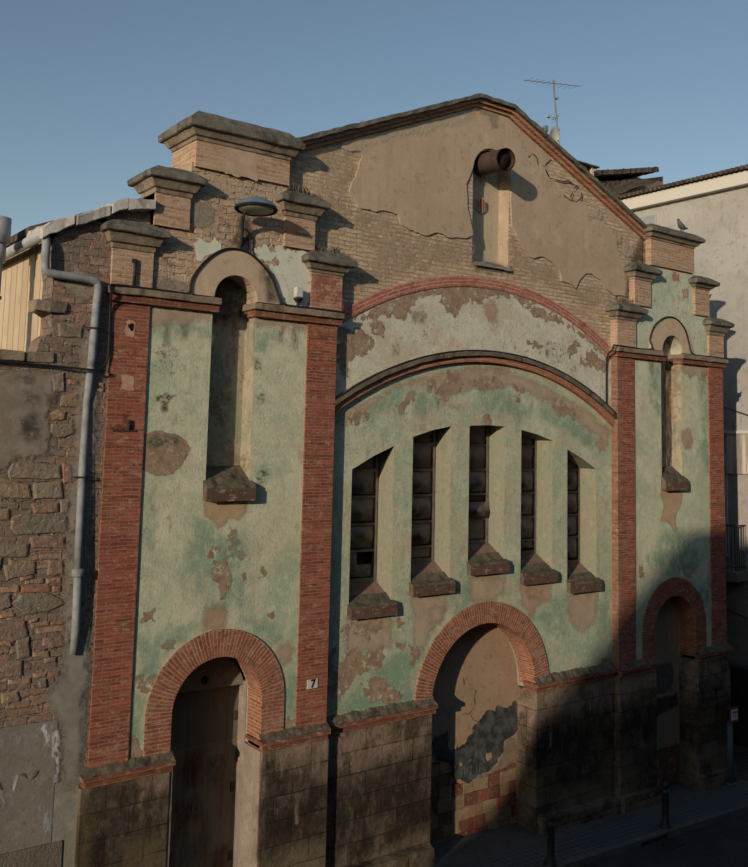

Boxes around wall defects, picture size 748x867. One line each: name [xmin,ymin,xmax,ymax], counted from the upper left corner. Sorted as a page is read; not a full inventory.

flaking render [142,430,190,476]
flaking render [202,501,267,630]
flaking render [335,286,623,664]
flaking render [661,490,682,532]
flaking render [328,595,447,705]
spalling [475,738,517,779]